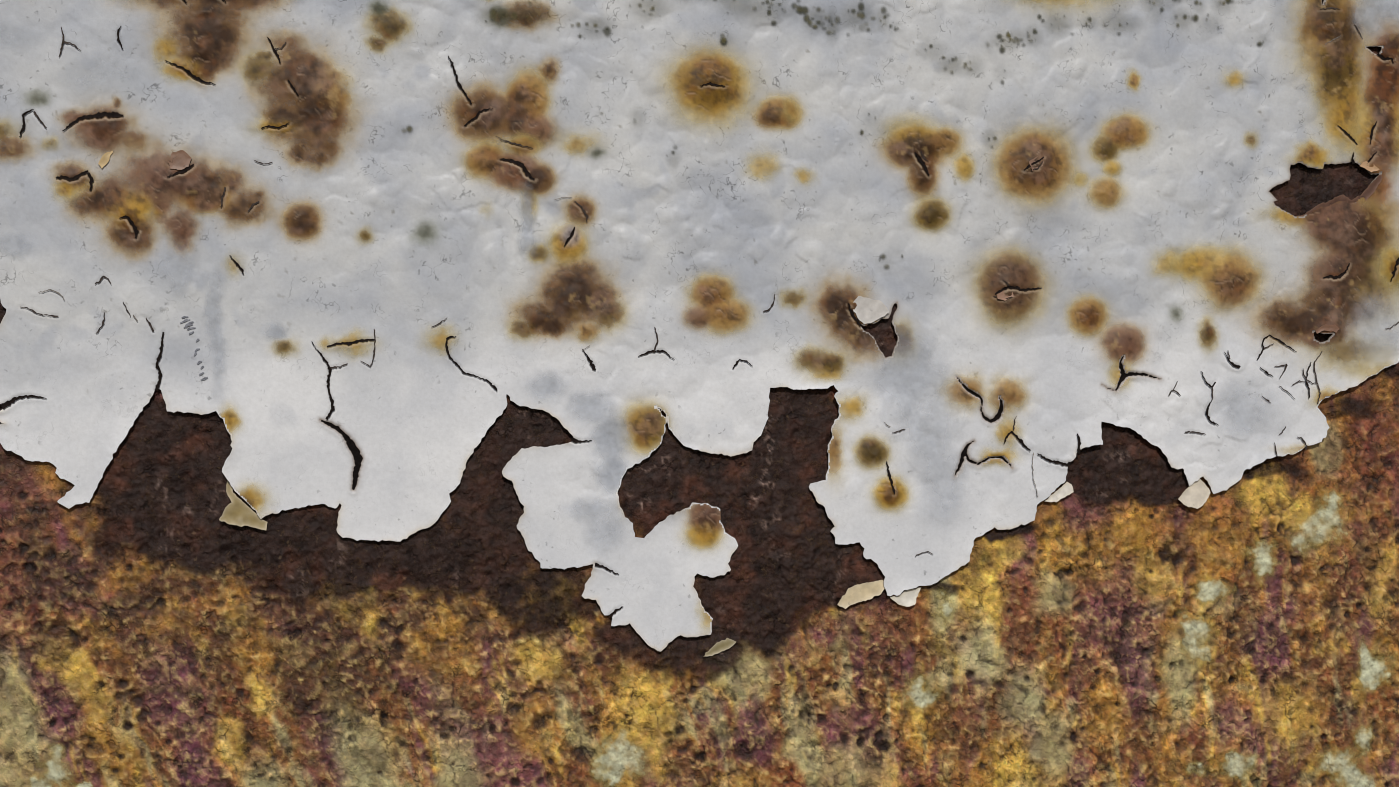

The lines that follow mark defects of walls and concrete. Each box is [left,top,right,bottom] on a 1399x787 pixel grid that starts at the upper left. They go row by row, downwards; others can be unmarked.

rust [149,0,352,169]
crack [1320,0,1394,63]
rust [56,98,267,256]
rust [1158,0,1399,375]
peeling [1269,162,1382,216]
rust [510,197,625,341]
peeling [97,394,585,635]
crack [312,329,376,490]
peeling [595,386,959,679]
crack [955,377,1081,497]
peeling [1045,422,1211,509]
crack [1107,334,1322,456]